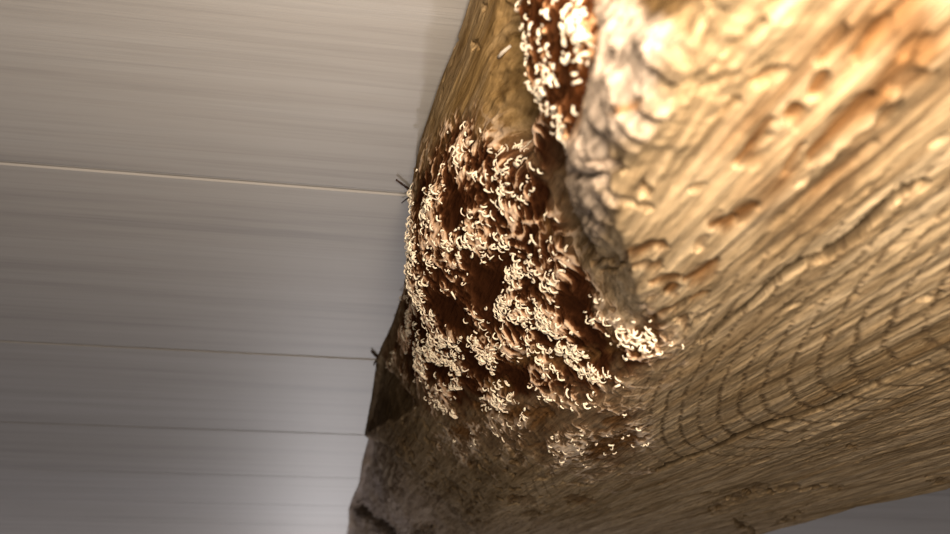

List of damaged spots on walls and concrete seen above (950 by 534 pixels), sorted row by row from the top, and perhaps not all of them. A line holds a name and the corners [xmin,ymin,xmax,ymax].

peeling [514,0,596,146]
peeling [385,121,624,442]
peeling [583,296,684,361]
peeling [548,428,649,468]
crack [655,359,932,473]